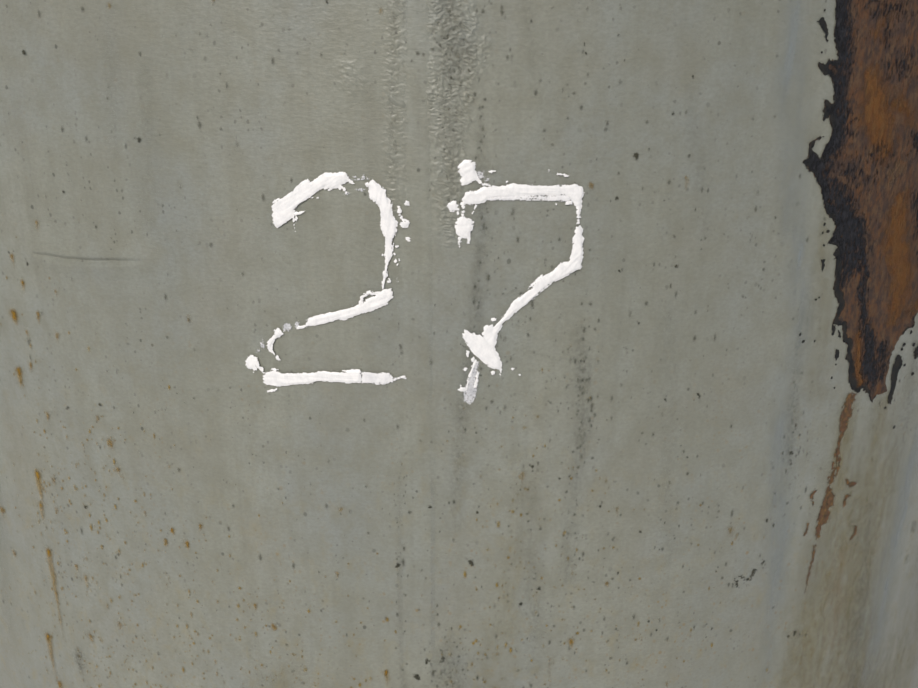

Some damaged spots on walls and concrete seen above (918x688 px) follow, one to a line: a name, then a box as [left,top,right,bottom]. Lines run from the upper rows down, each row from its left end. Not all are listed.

peeling [803,0,918,409]
rust [804,393,857,593]